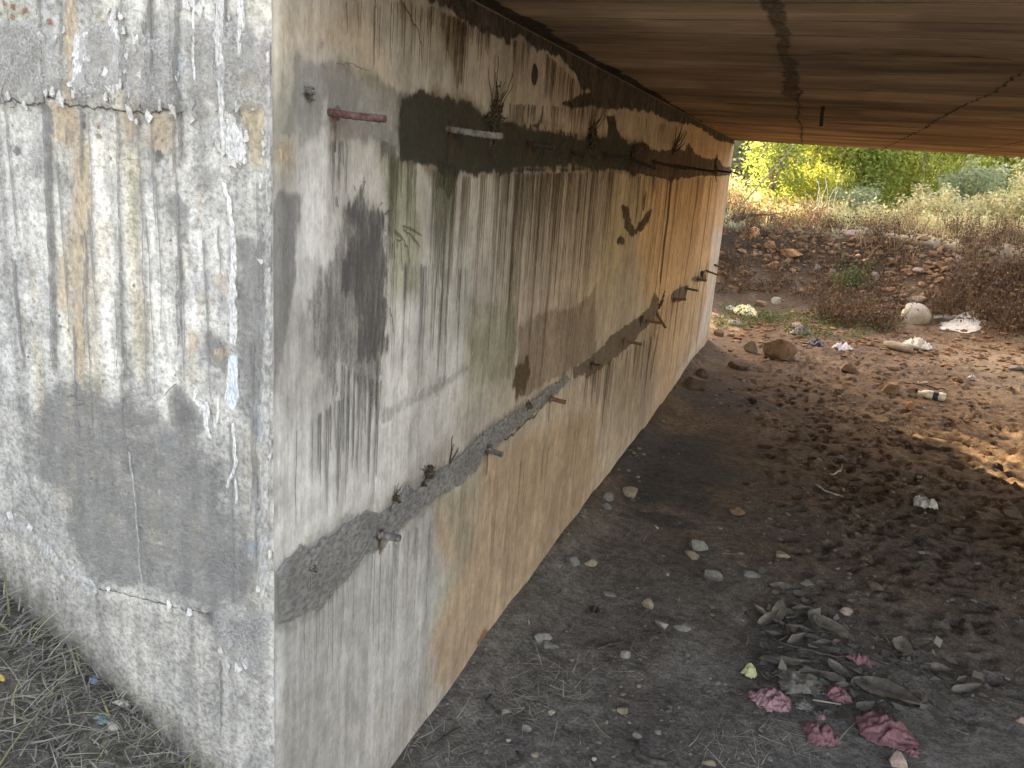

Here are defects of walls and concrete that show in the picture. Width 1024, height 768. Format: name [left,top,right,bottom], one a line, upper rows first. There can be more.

damp [2,98,17,233]
crack [0,52,196,125]
damp [213,0,245,150]
crack [882,73,1021,150]
damp [309,0,735,509]
damp [35,103,300,638]
crack [79,581,212,618]